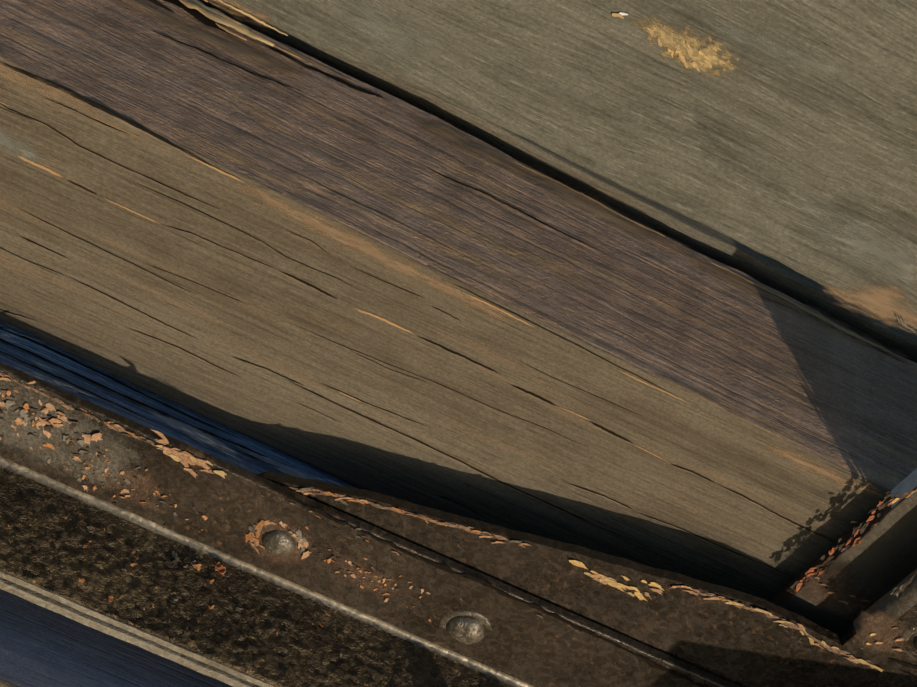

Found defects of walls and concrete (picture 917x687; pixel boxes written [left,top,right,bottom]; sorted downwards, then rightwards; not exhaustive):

crack [148,0,233,35]
crack [153,31,300,91]
crack [264,44,386,99]
peeling [646,27,712,72]
crack [0,62,834,560]
rust [830,286,917,328]
peeling [0,373,227,531]
peeling [245,520,430,607]
peeling [284,486,531,548]
crack [568,484,789,577]
rust [790,491,906,653]
peeling [569,560,884,672]